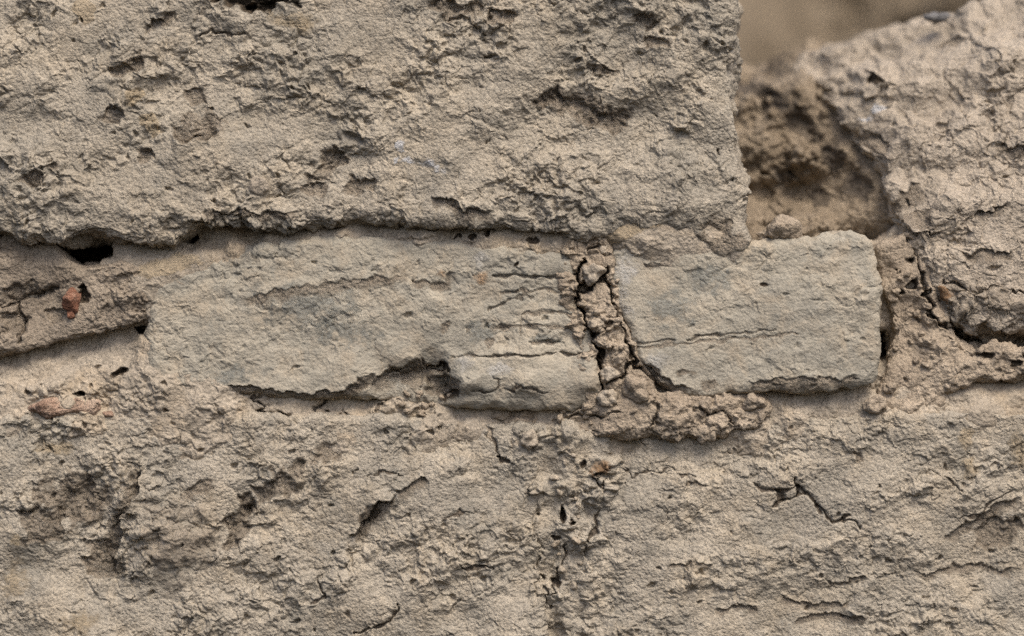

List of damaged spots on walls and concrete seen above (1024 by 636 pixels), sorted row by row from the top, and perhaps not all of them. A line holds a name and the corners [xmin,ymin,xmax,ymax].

spalling [737,80,873,207]
spalling [856,131,889,153]
spalling [891,183,935,238]
crack [906,238,1024,330]
crack [570,245,660,426]
crack [754,478,861,529]